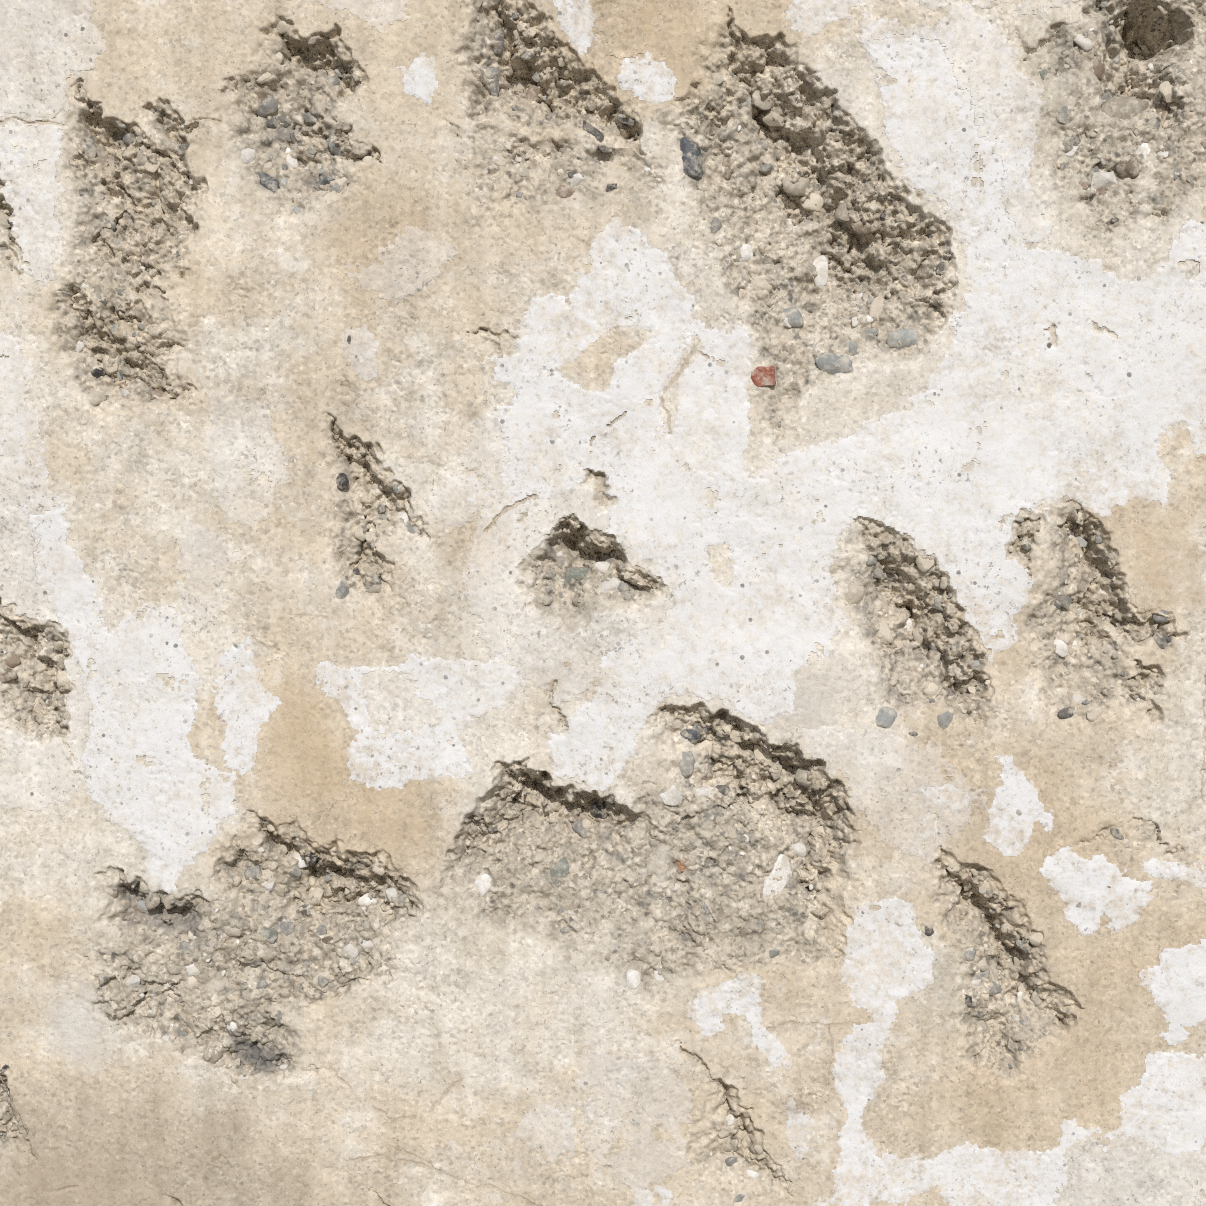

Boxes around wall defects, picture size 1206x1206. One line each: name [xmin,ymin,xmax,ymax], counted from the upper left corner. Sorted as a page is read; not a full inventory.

spalling [0,0,291,530]
spalling [218,0,412,222]
peeling [0,332,282,913]
peeling [315,0,1206,1206]
spalling [0,1076,28,1142]
spalling [78,808,424,1088]